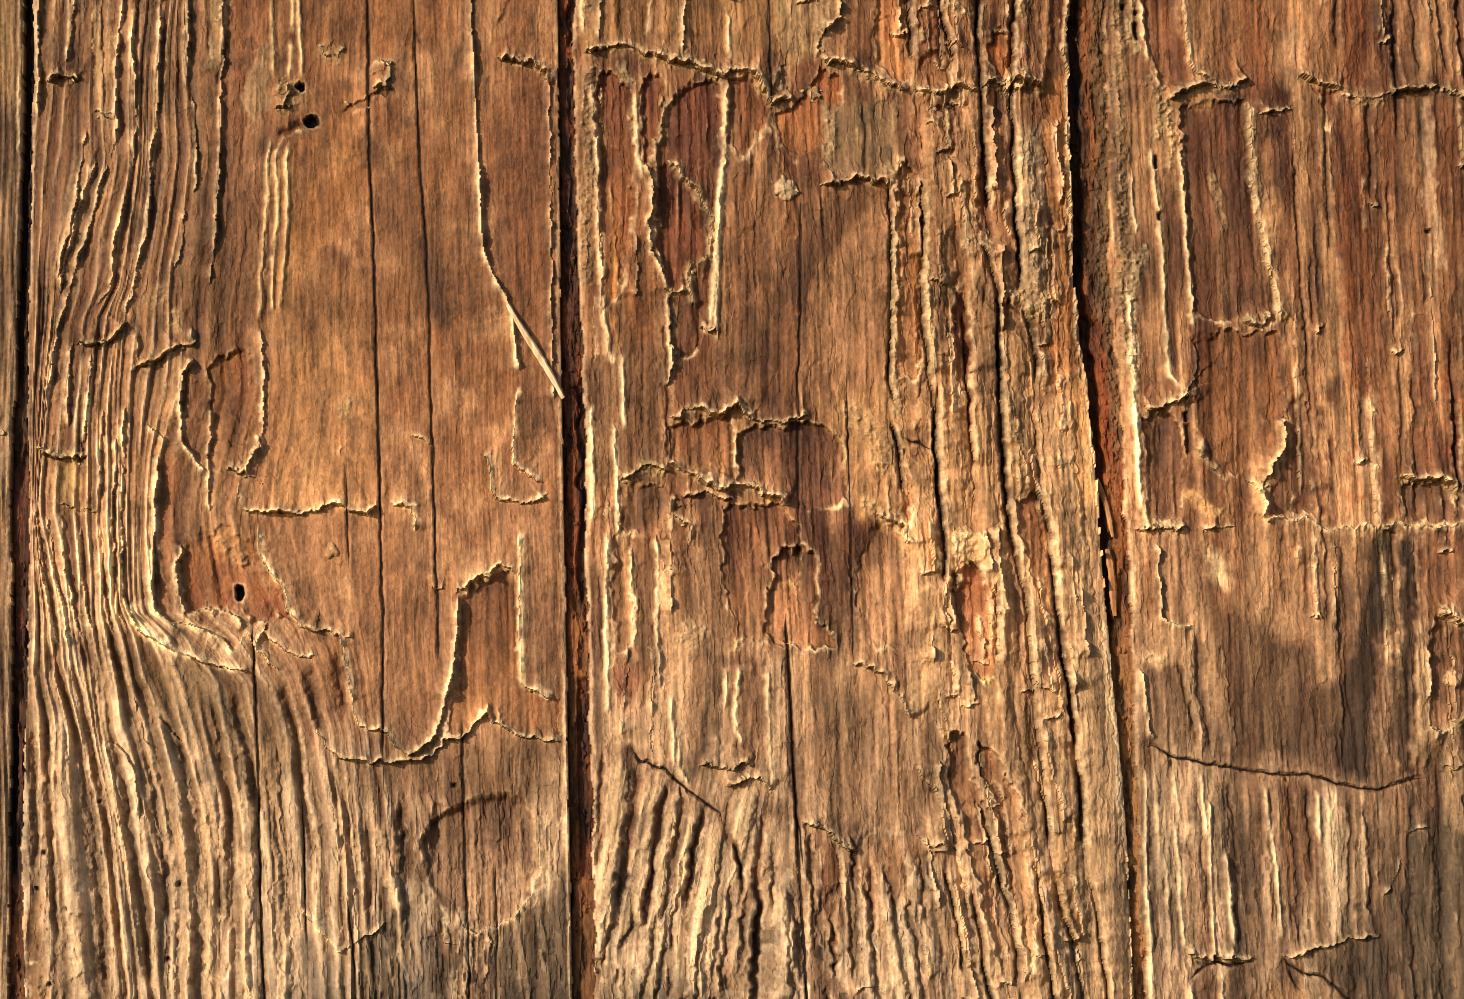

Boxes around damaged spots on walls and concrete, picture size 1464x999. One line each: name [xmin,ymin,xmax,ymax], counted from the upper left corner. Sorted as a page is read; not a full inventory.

spalling [581,0,1083,401]
spalling [1134,0,1464,537]
spalling [208,347,266,479]
spalling [170,497,563,767]
spalling [610,395,918,721]
spalling [950,562,1000,681]
spalling [1016,489,1060,622]
spalling [1422,604,1464,743]
crack [631,748,722,821]
crack [785,616,808,999]
crack [1147,745,1419,790]
crack [1190,958,1348,999]